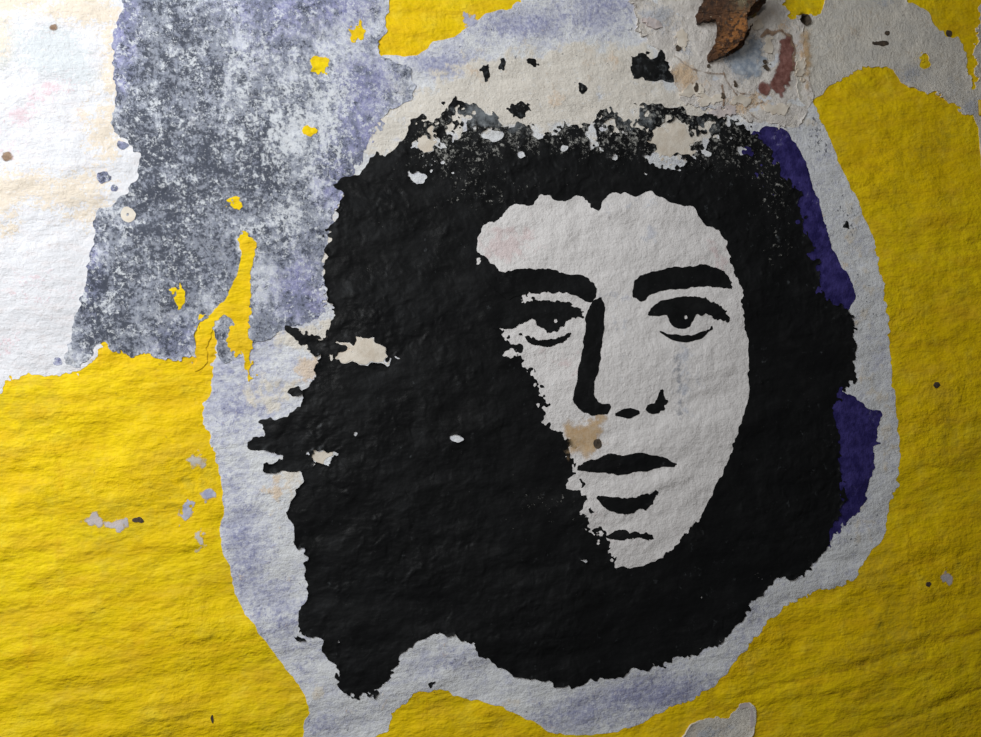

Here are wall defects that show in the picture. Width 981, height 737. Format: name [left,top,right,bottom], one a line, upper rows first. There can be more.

corrosion [758,29,810,98]
flaking render [628,0,981,154]
peeling [417,126,437,153]
peeling [647,122,697,166]
peeling [187,455,206,468]
peeling [85,512,144,533]
peeling [178,489,216,526]
peeling [682,702,756,737]